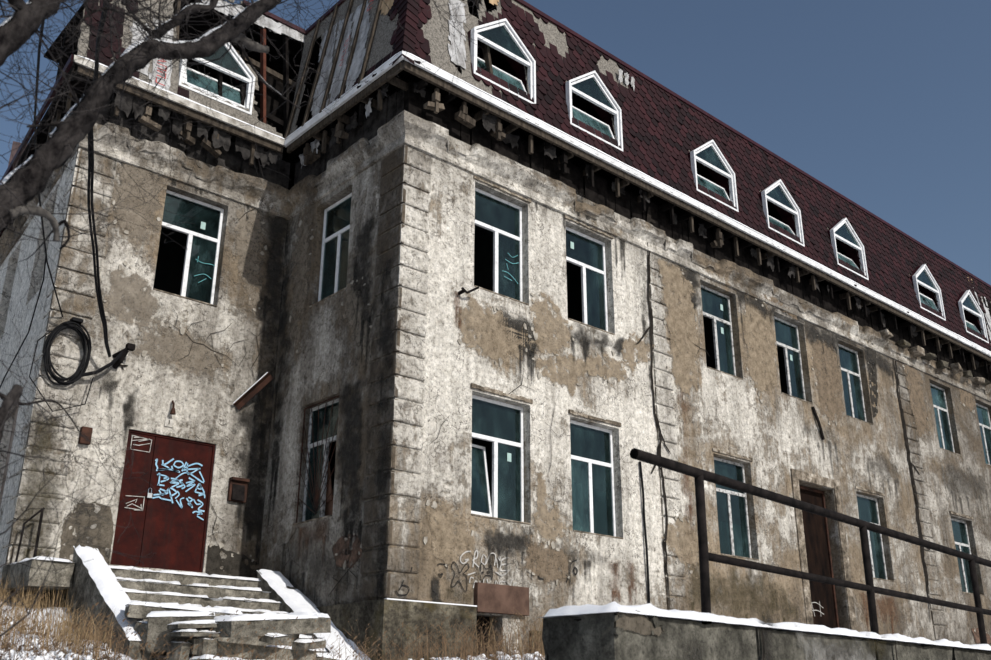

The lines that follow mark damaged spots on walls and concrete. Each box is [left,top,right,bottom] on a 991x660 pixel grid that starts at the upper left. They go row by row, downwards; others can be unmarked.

water stain [503,313,537,380]
peeling [456,290,654,396]
peeling [657,254,703,400]
flaking render [59,499,114,563]